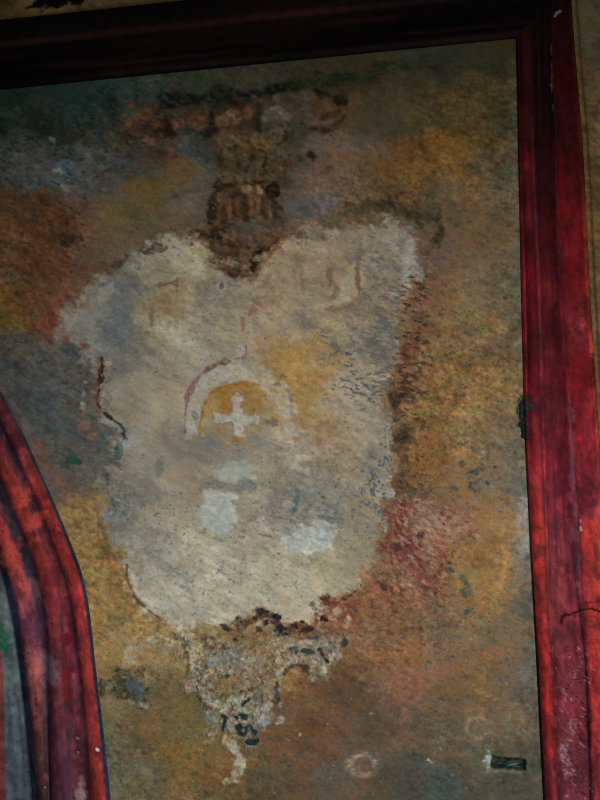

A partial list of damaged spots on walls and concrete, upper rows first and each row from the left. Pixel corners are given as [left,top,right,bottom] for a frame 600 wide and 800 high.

crack [74,355,137,509]
peeling [44,194,484,788]
peeling [24,645,49,681]
peeling [72,776,89,800]